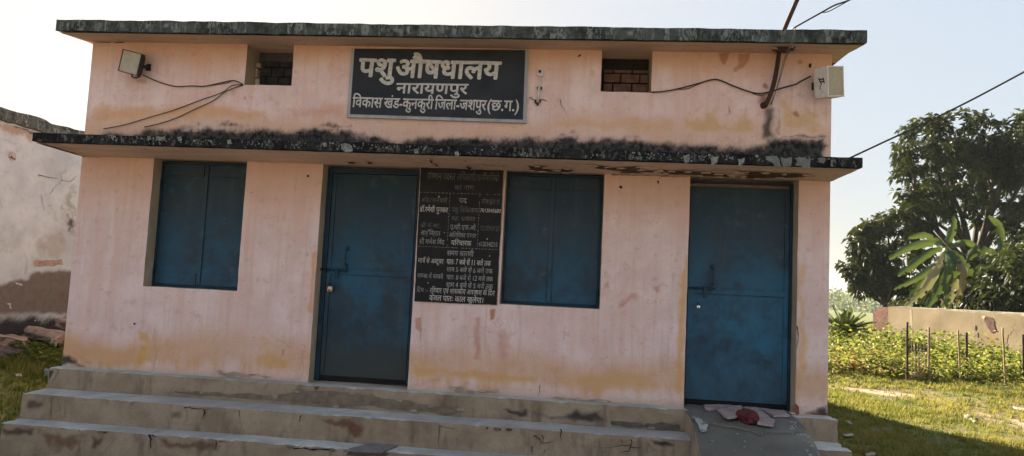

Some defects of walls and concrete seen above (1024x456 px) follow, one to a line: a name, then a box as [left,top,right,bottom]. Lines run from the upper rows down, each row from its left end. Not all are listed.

damp [85,76,831,157]
peeling [585,152,836,180]
damp [244,325,303,380]
damp [409,248,688,427]